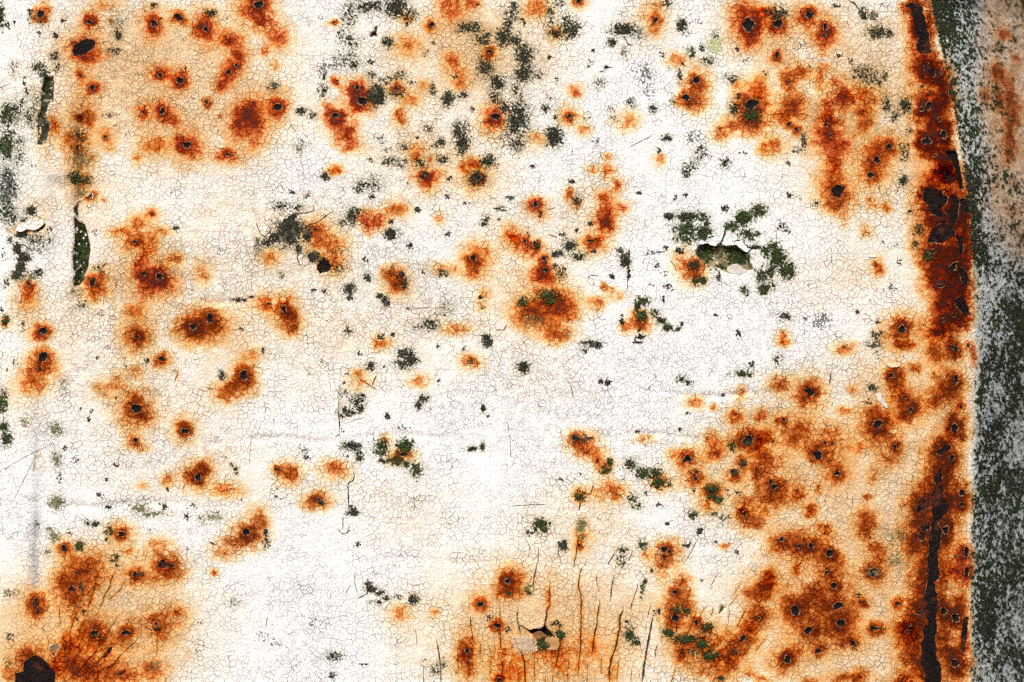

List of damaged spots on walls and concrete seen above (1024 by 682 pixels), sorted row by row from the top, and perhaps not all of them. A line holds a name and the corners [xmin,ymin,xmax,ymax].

corrosion [69,14,100,95]
corrosion [145,9,245,91]
peeling [71,217,91,287]
peeling [691,235,753,274]
crack [710,227,756,272]
corrosion [173,308,227,343]
corrosion [664,0,977,682]
crack [338,473,354,534]
corrosion [5,541,184,682]
crack [59,570,158,680]
peeling [512,598,560,656]
crack [415,537,766,682]